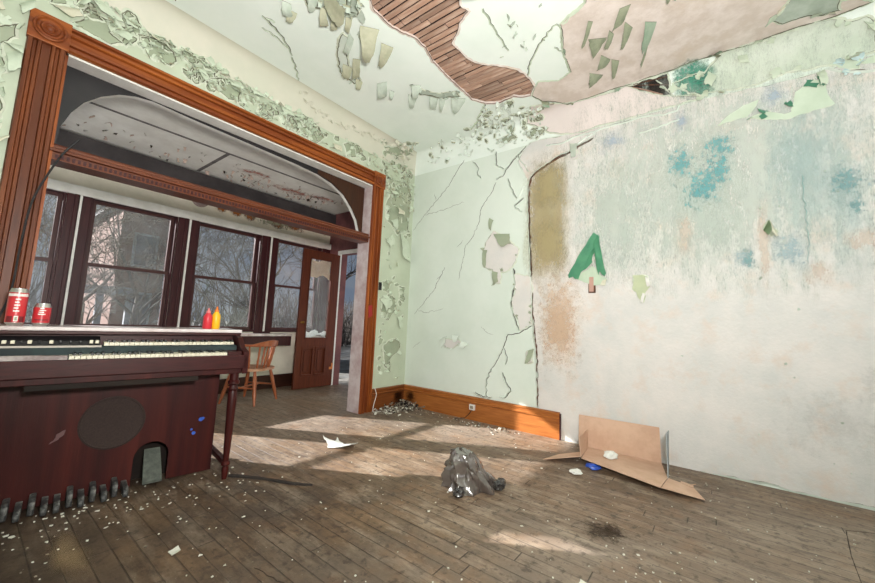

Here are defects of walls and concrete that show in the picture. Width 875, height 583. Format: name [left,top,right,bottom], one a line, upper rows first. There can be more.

damp [673,59,713,97]
peeling [49,0,419,378]
damp [527,167,566,268]
crack [416,104,680,407]
peeling [304,0,875,510]
damp [668,136,734,208]
damp [831,160,865,214]